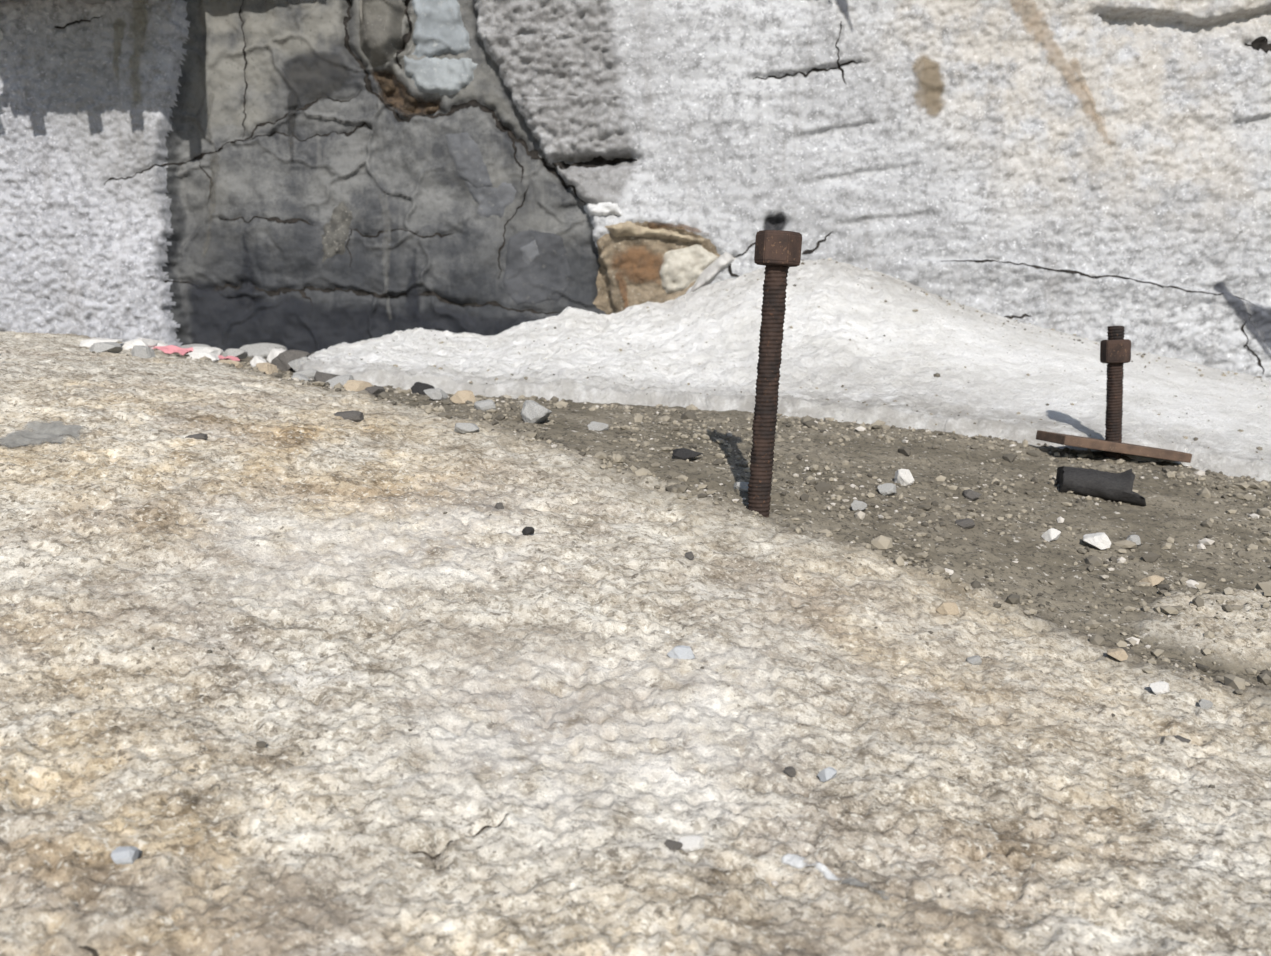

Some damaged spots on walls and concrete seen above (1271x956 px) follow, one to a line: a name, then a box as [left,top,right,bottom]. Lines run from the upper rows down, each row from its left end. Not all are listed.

peeling [373,0,478,117]
crack [753,23,869,86]
crack [1245,36,1271,54]
crack [104,0,637,314]
crack [952,259,1264,374]